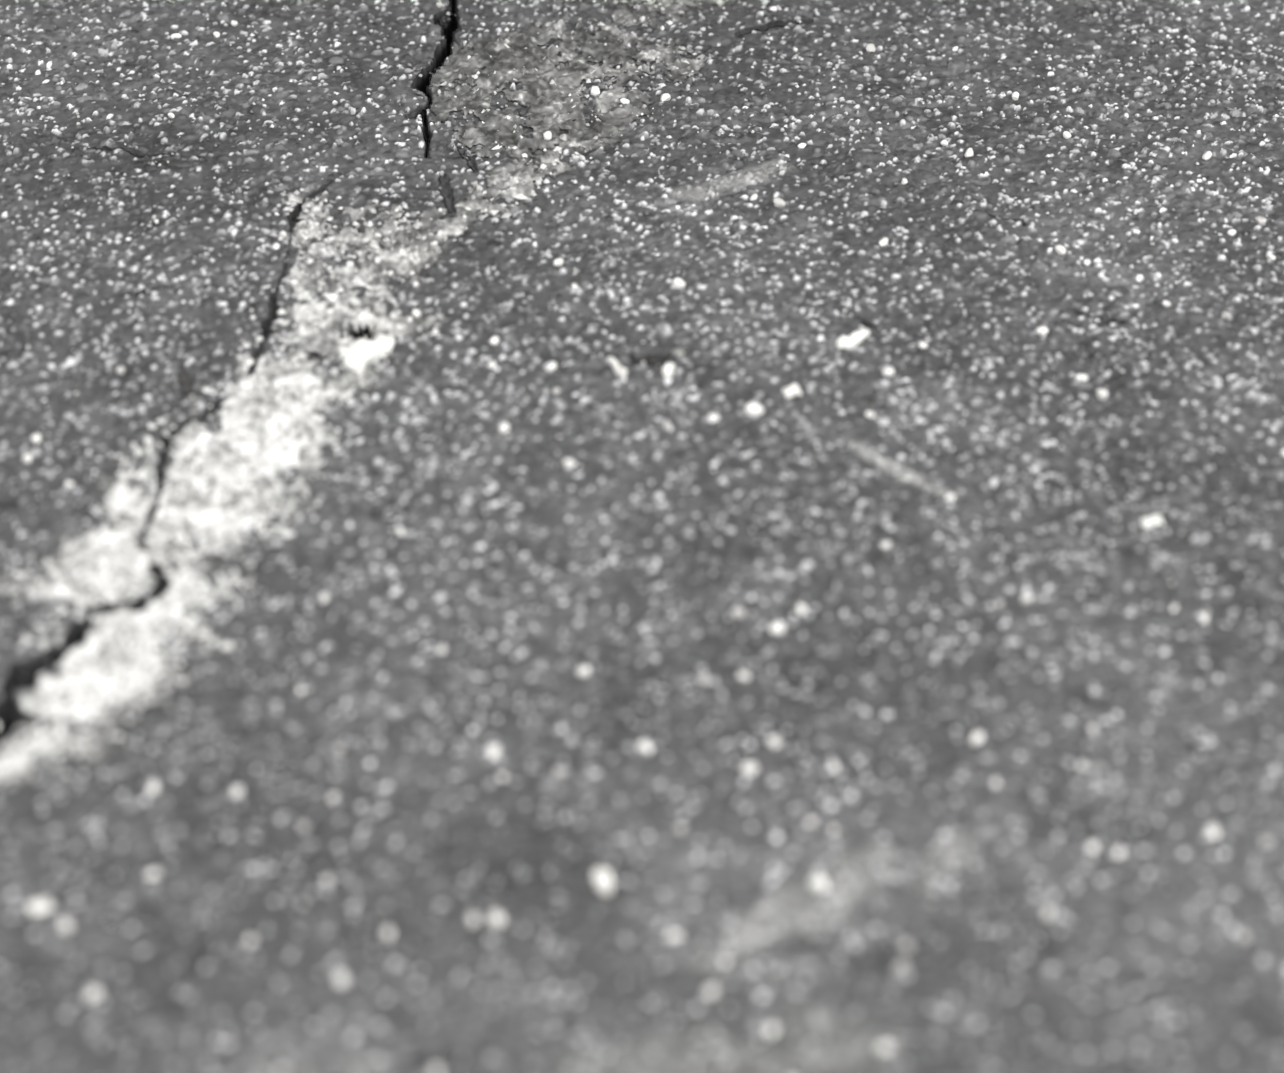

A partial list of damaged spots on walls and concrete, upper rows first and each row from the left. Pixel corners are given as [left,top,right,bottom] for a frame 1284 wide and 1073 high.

crack [87,146,167,157]
crack [406,0,477,218]
crack [0,180,333,749]